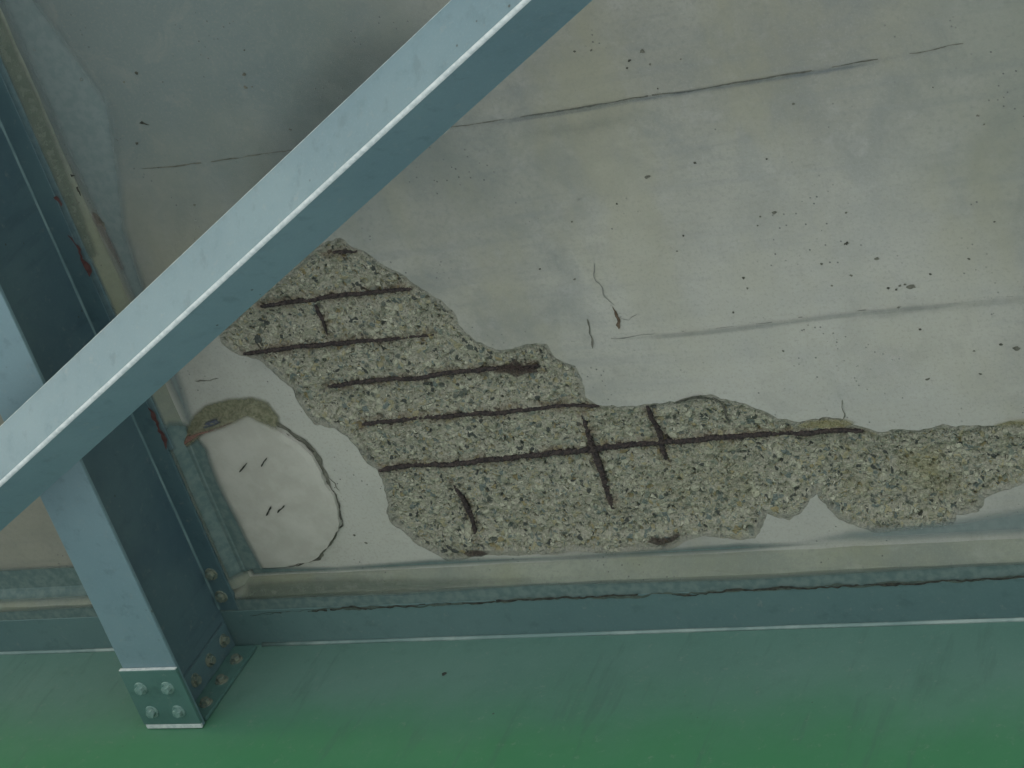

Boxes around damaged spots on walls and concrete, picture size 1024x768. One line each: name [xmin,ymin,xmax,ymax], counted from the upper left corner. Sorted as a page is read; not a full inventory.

crack [452,59,878,127]
crack [145,150,292,169]
crack [571,264,650,349]
rust [494,360,538,378]
spalling [219,238,1024,561]
crack [250,575,1024,616]